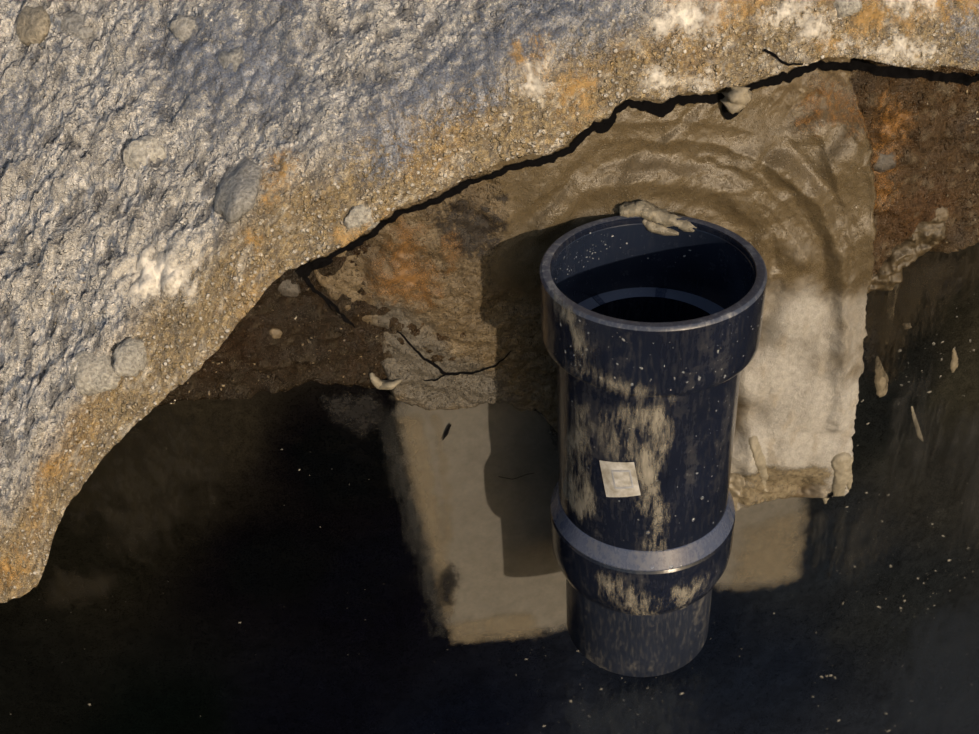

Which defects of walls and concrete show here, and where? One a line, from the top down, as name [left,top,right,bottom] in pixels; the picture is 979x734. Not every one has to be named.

spalling [435,194,509,260]
crack [295,49,979,328]
spalling [720,86,752,114]
corrosion [868,90,912,208]
peeling [369,372,401,390]
crack [397,331,511,381]
peeling [397,401,567,641]
peeling [715,466,831,588]